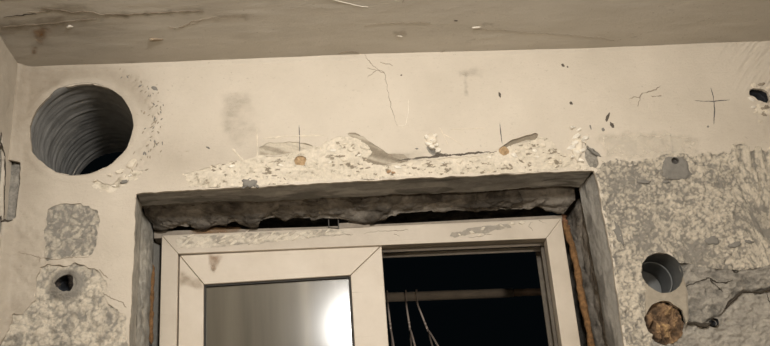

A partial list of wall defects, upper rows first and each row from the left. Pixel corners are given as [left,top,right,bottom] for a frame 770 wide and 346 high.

crack [340,51,396,122]
spalling [0,186,608,346]
spalling [183,125,770,346]
crack [687,320,711,328]
crack [687,269,770,310]